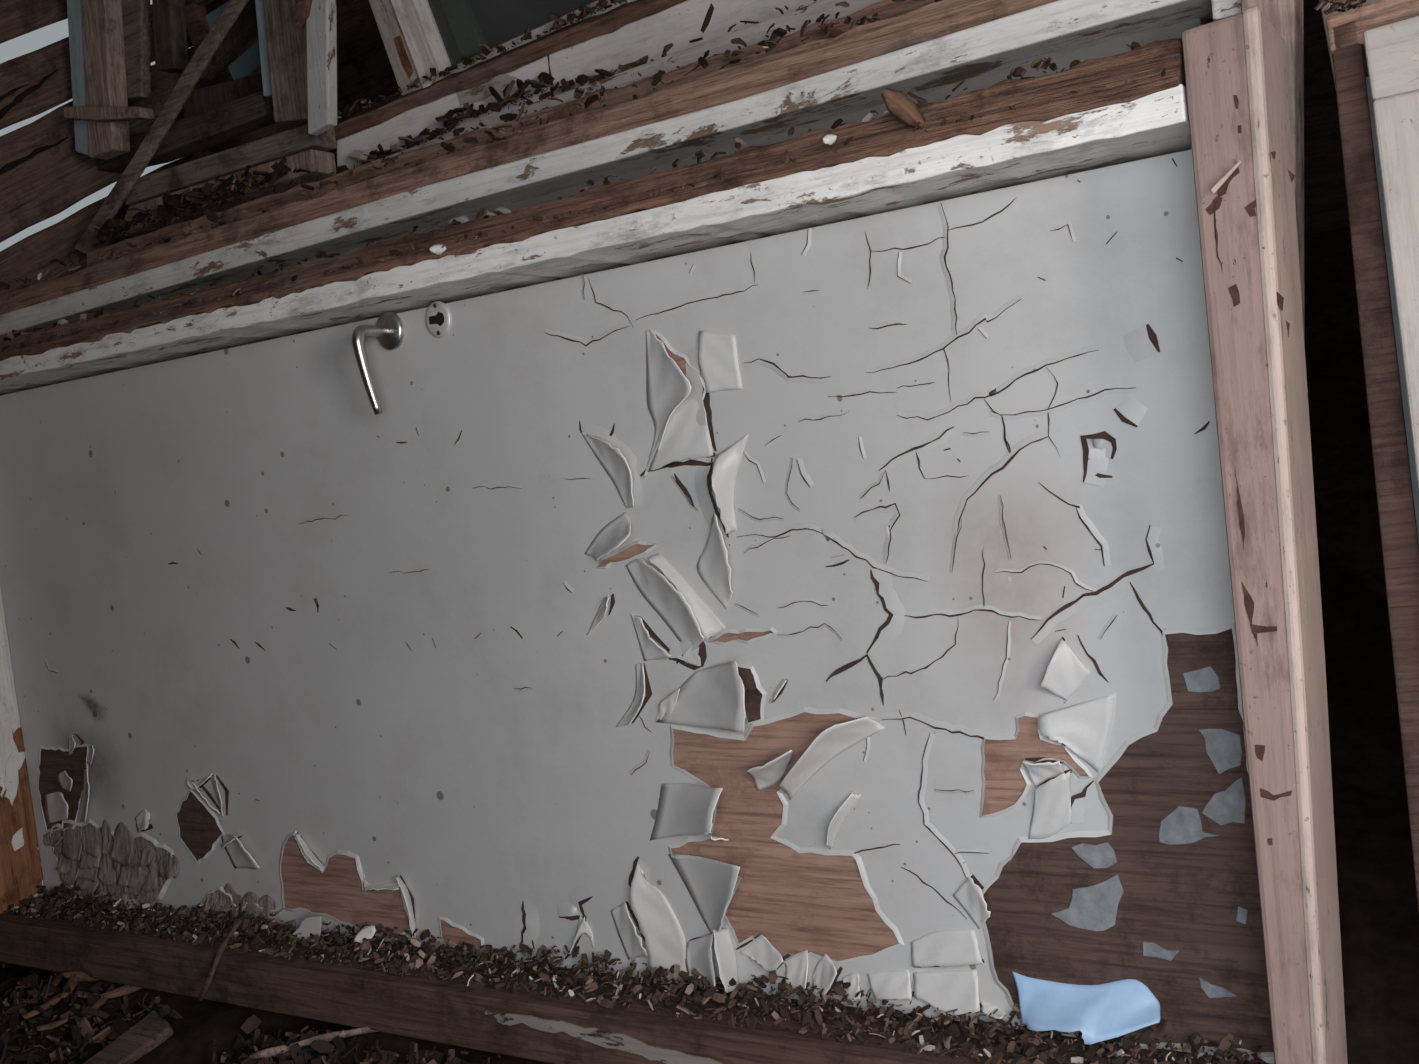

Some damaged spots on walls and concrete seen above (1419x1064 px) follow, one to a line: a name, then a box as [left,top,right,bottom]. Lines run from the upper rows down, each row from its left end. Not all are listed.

crack [545,260,760,346]
crack [579,198,1165,918]
peeling [581,329,1274,1058]
peeling [0,734,417,944]
peeling [439,916,484,950]
peeling [569,916,594,954]